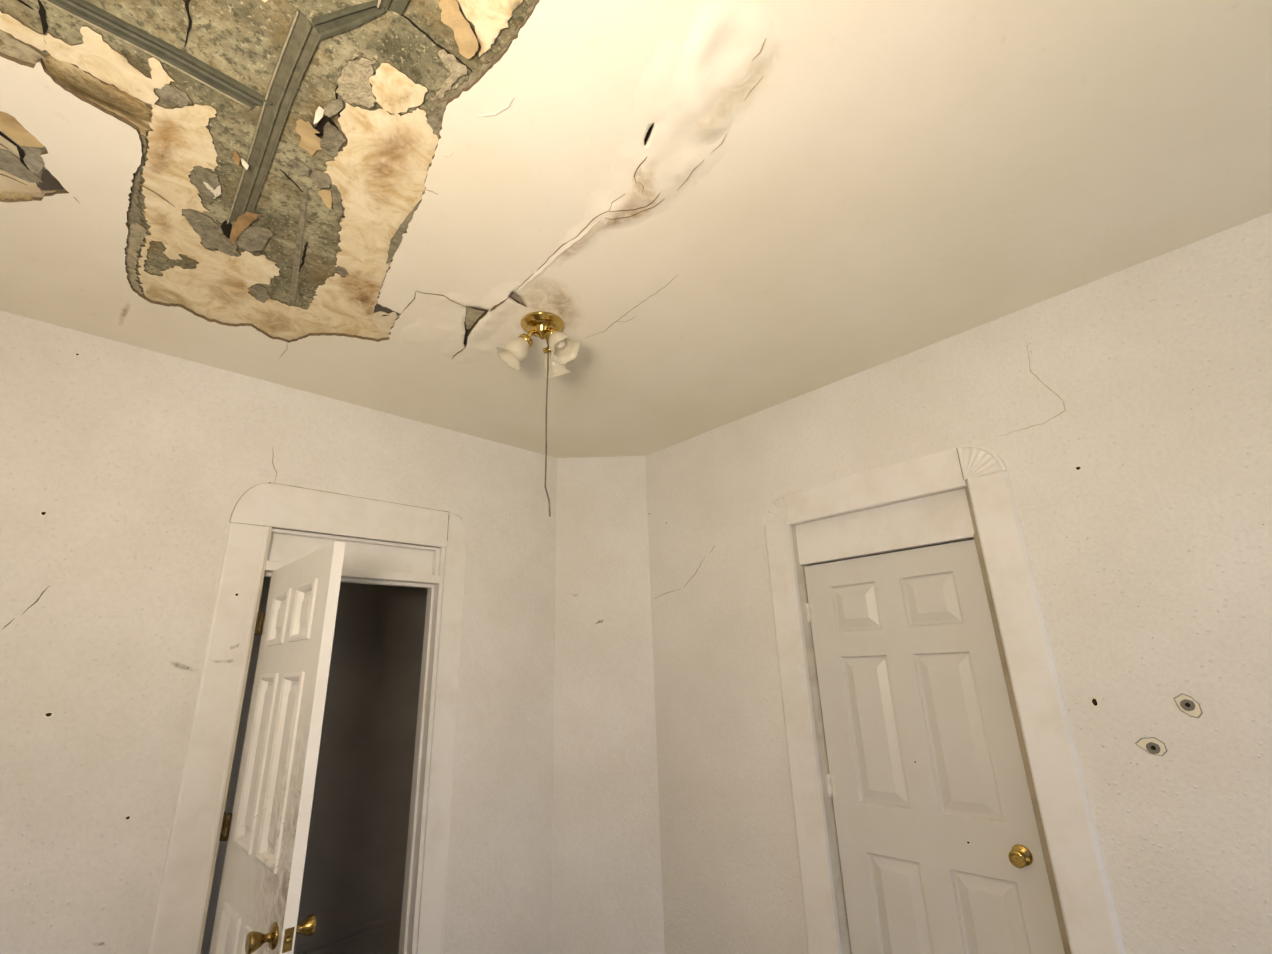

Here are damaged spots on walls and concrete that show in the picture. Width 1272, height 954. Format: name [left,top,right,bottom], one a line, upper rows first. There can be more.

flaking render [155,84,193,107]
peeling [427,0,537,138]
crack [744,38,766,101]
peeling [232,151,249,170]
flaking render [288,56,376,219]
flaking render [126,134,147,295]
flaking render [182,166,273,257]
crack [403,133,728,312]
flaking render [247,284,271,303]
flaking render [464,306,487,344]
crack [586,275,678,338]